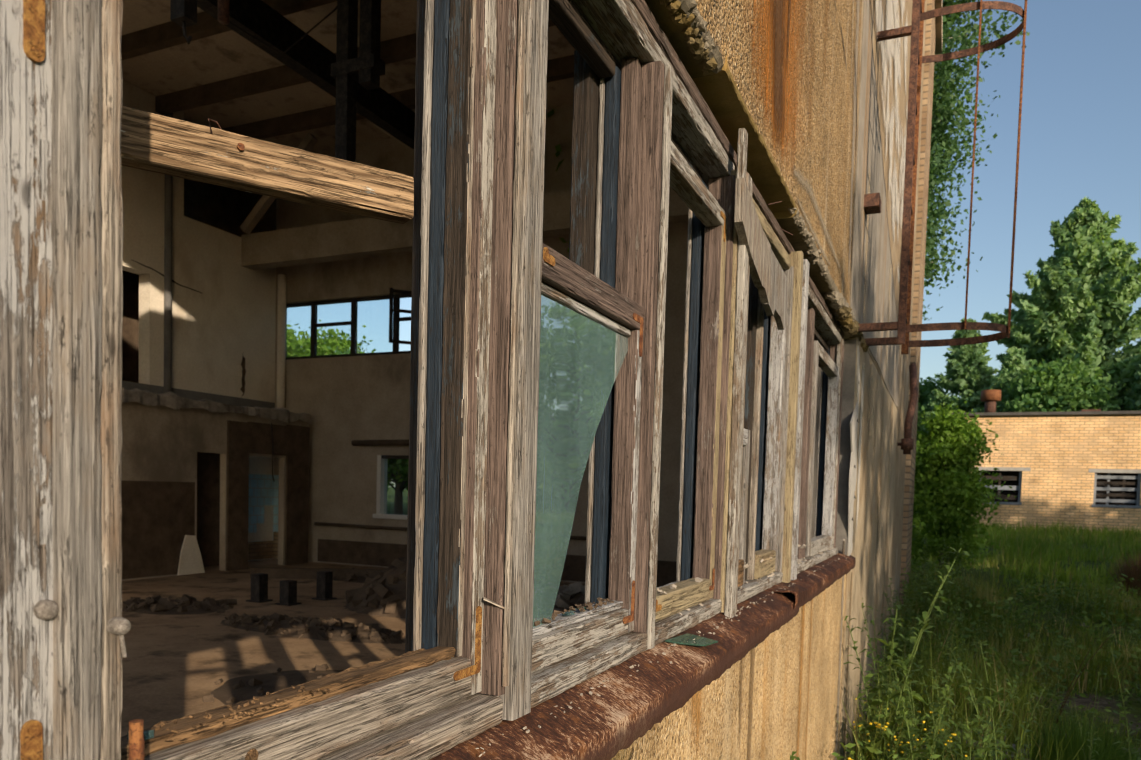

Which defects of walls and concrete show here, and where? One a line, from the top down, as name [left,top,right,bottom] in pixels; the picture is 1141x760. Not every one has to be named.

corrosion [753,0,804,151]
corrosion [796,599,813,757]